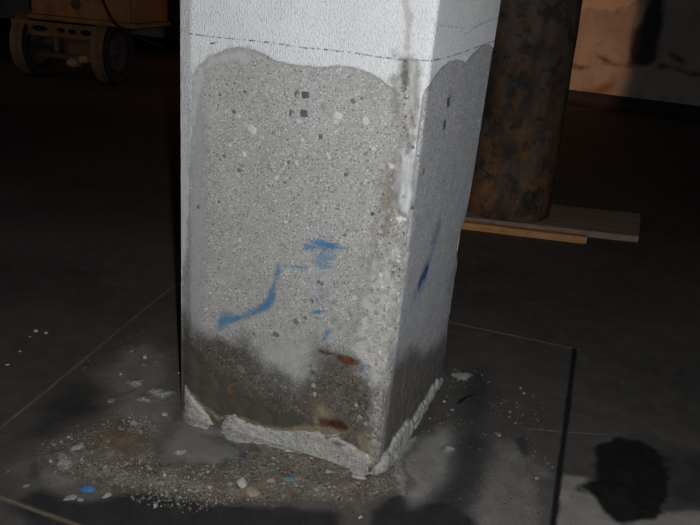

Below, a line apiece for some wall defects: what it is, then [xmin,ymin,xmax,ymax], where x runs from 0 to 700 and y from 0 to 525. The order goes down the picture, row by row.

peeling [181,45,493,479]
damp [181,321,446,472]
rust [321,351,358,365]
rust [314,404,372,456]